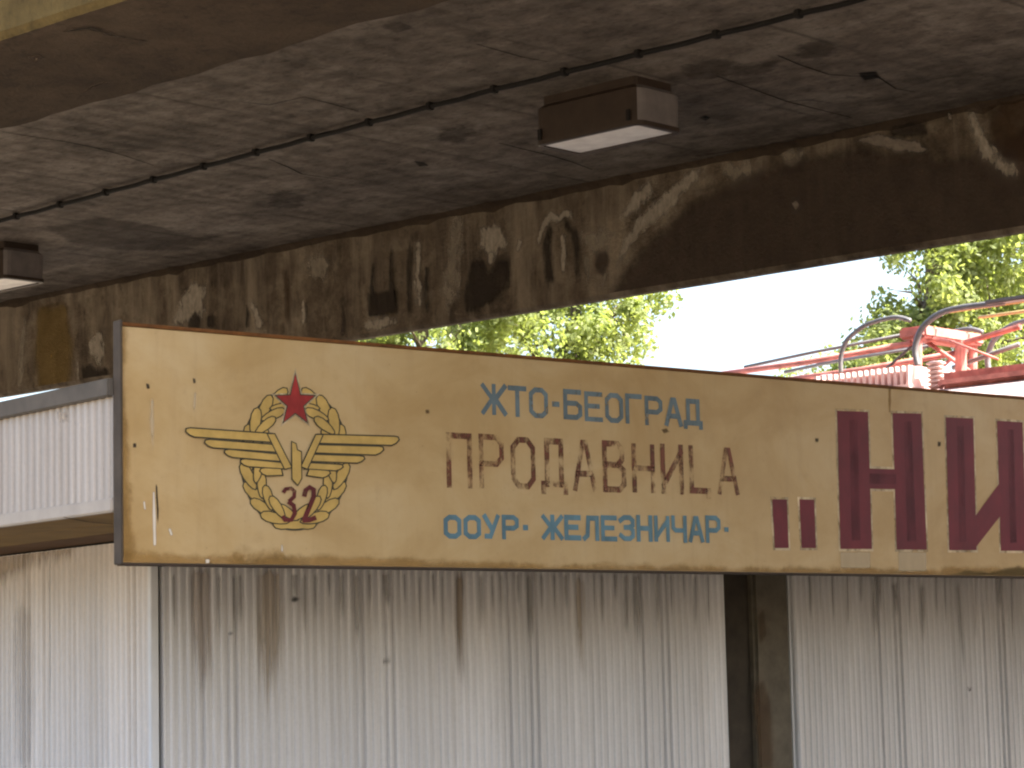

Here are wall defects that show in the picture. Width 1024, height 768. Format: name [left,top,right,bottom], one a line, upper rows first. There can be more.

spalling [859,122,927,152]
leakage [365,242,428,331]
leakage [443,216,522,313]
leakage [193,571,209,669]